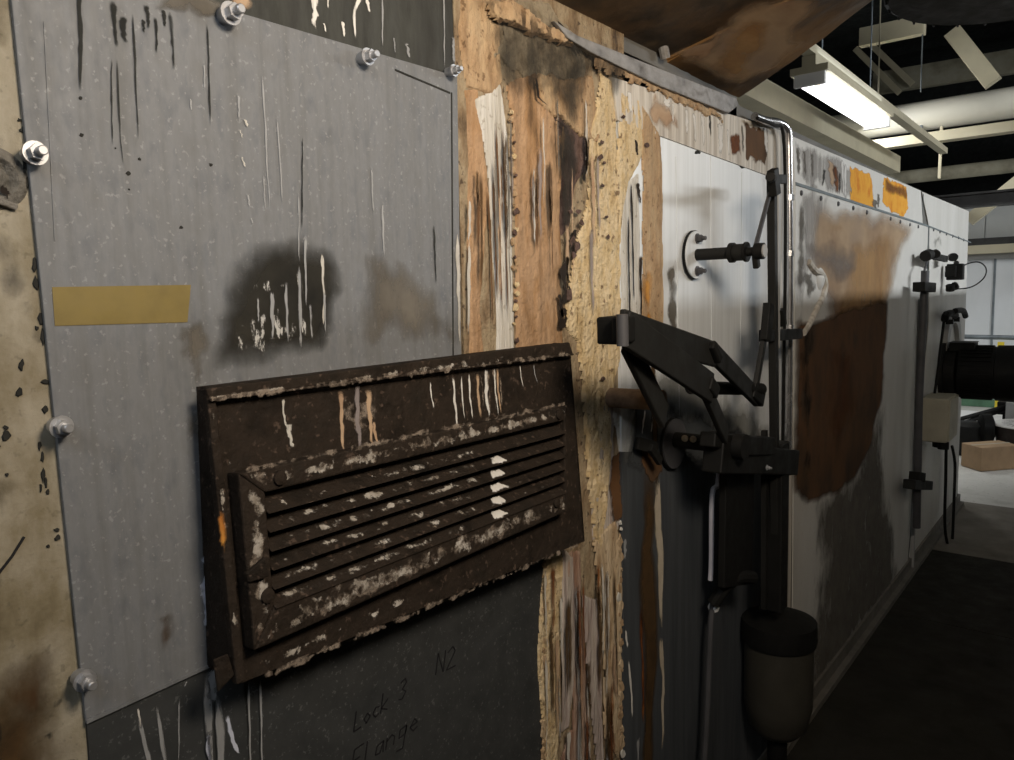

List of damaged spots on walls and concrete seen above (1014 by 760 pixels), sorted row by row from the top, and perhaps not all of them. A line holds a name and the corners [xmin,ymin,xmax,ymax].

peeling [458,0,572,94]
damp [262,80,282,201]
damp [257,139,326,342]
peeling [211,387,303,401]
peeling [331,361,466,387]
peeling [343,402,565,465]
peeling [482,73,664,760]
peeling [411,465,476,514]
peeling [248,492,265,565]
peeling [291,491,443,625]
peeling [455,510,537,552]
peeling [266,635,340,676]